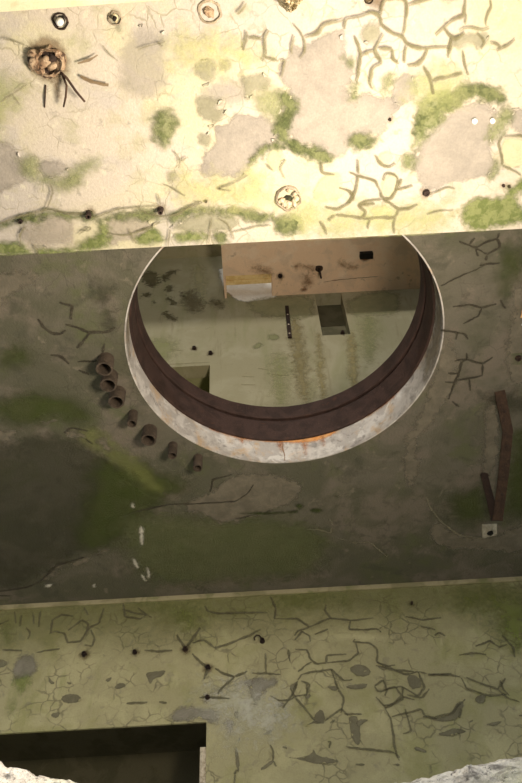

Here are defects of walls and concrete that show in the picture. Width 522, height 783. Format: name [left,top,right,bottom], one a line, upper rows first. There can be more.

crack [78,49,114,86]
crack [1,184,269,254]
spalling [278,0,303,13]
peeling [196,31,418,178]
crack [237,0,514,94]
crack [320,156,455,235]
peeling [412,100,522,189]
crack [498,135,522,176]
crack [441,300,505,407]
corrosion [274,431,335,446]
water stain [0,438,324,587]
crack [145,596,522,766]